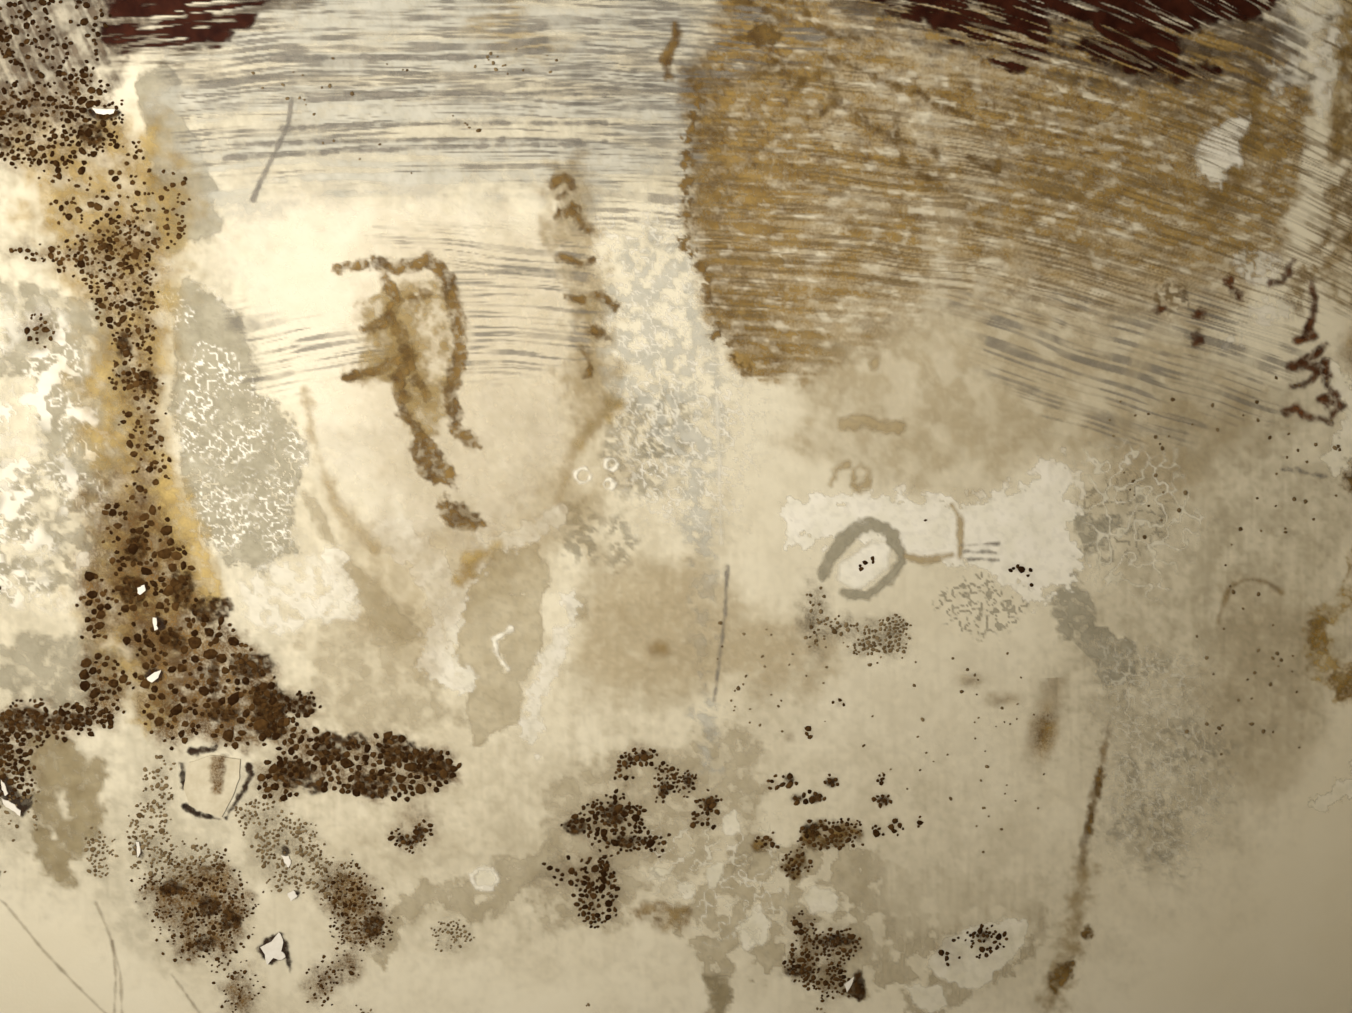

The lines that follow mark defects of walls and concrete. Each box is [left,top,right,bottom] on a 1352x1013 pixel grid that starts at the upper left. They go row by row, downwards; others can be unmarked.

leakage [680,0,1352,382]
rust [333,254,482,485]
rust [1283,284,1346,425]
leakage [0,0,462,1013]
rust [436,501,486,529]
leakage [804,505,963,667]
leakage [542,748,722,929]
leakage [752,769,923,880]
rust [1085,749,1105,834]
spalling [258,933,291,968]
leakage [782,910,862,1013]
rust [1049,895,1093,993]